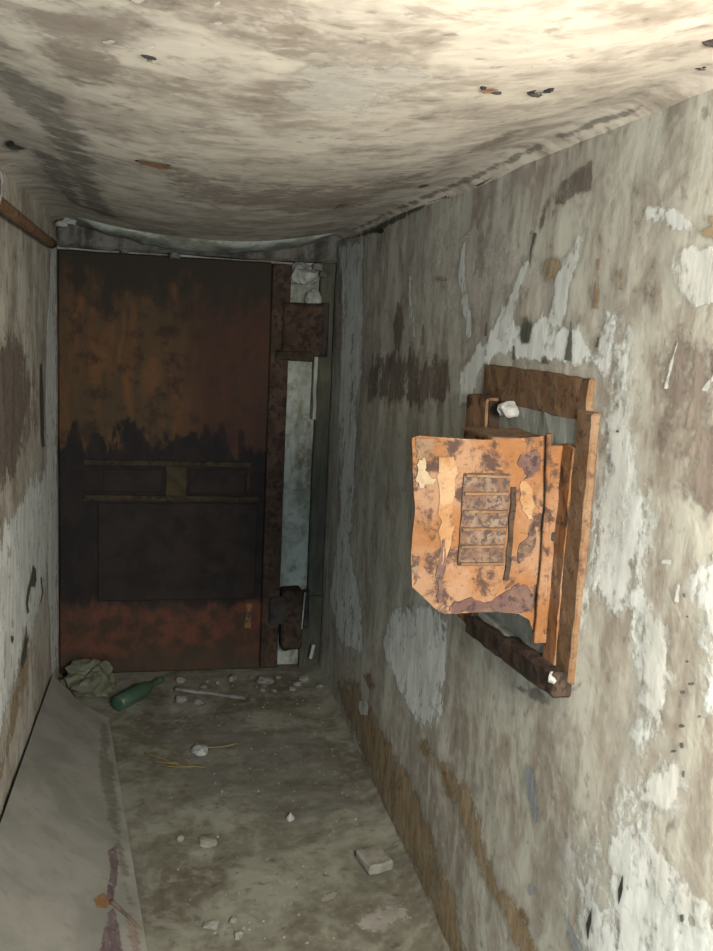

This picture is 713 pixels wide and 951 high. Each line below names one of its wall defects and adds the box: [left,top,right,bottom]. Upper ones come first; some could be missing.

leakage [0,69,119,219]
leakage [32,0,149,84]
leakage [280,56,447,109]
leakage [472,131,521,152]
leakage [582,110,634,129]
leakage [174,170,421,212]
leakage [353,145,541,230]
peeling [645,206,691,231]
peeling [672,245,713,307]
leakage [0,336,45,484]
rust [337,674,467,951]
rust [421,740,535,951]